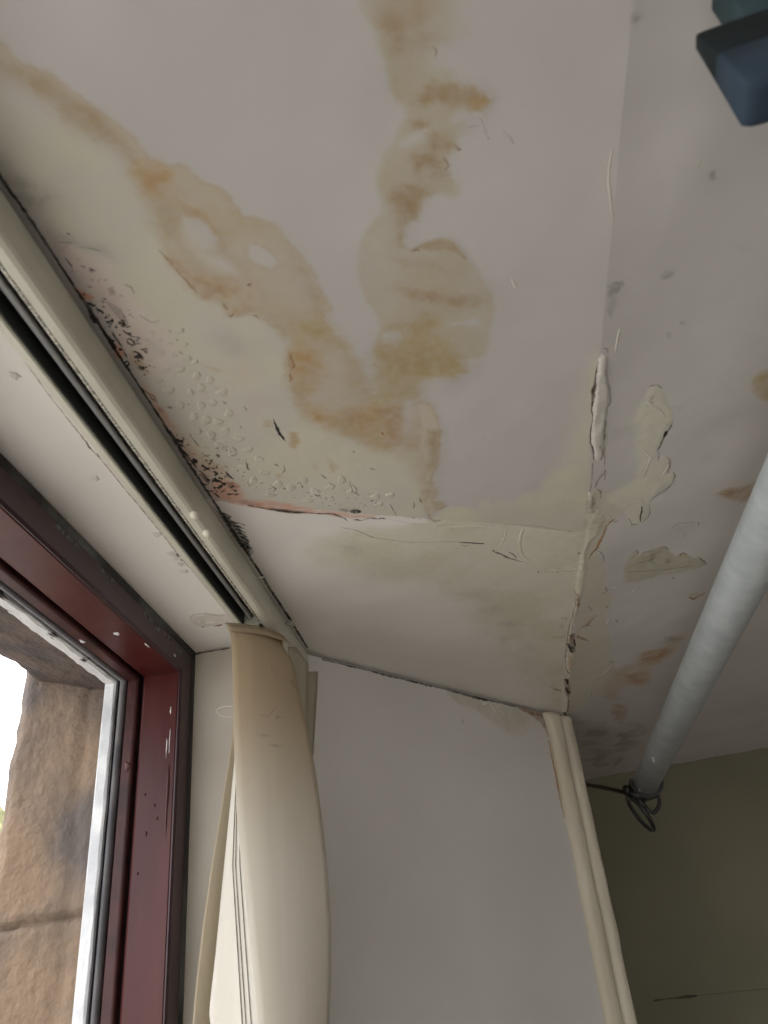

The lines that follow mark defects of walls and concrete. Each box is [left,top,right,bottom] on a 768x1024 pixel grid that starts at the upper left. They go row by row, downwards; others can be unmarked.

crack [0,143,542,713]
water stain [0,0,659,780]
peeling [617,545,708,586]